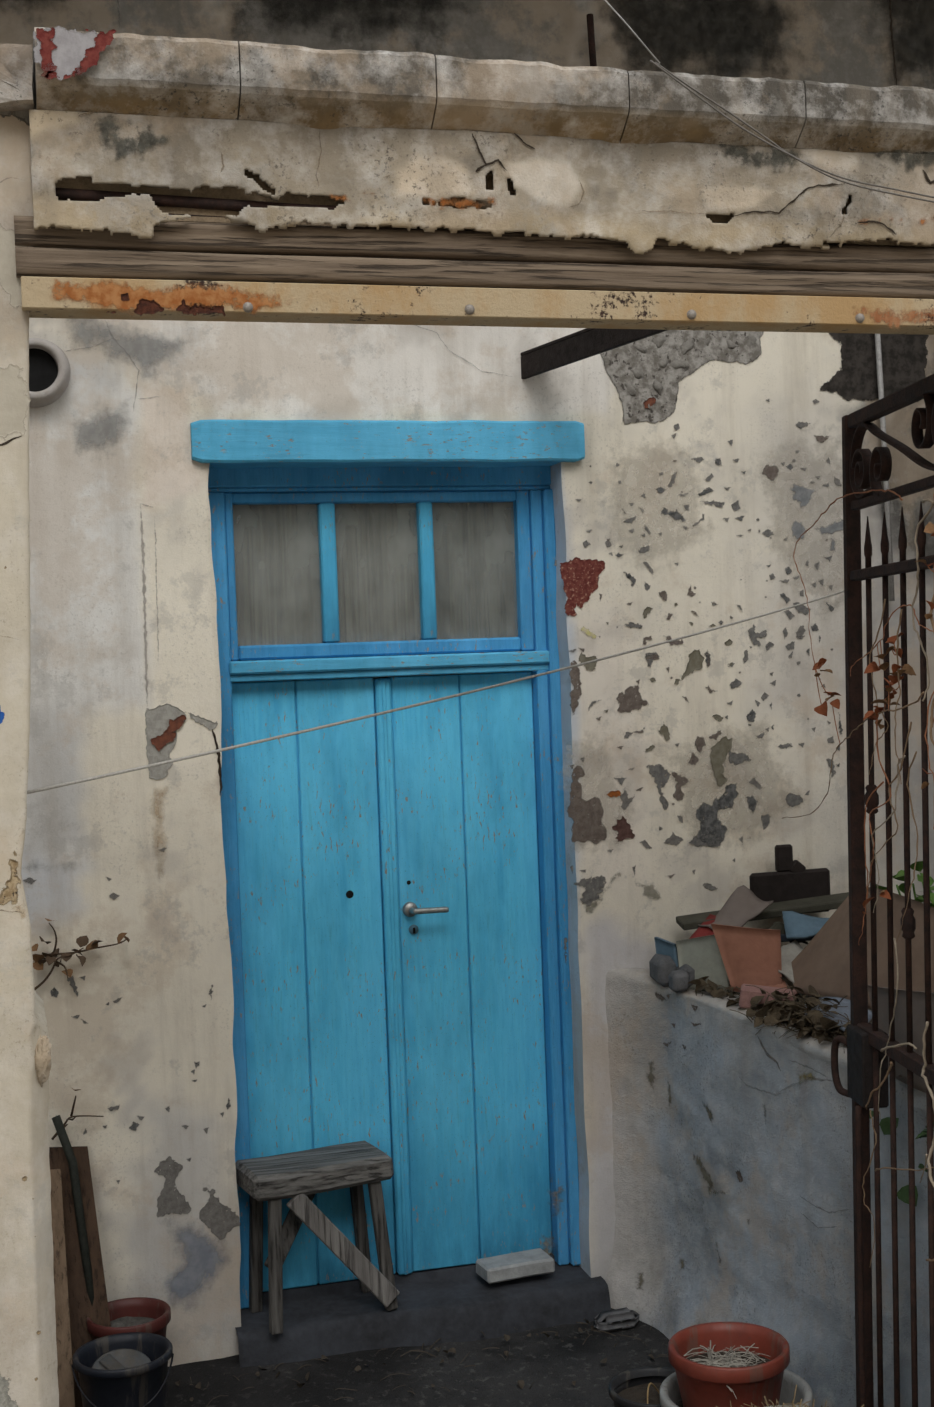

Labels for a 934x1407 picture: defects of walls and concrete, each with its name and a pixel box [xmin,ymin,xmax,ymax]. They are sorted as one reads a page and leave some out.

spalling [0,44,35,126]
crack [472,133,535,172]
crack [647,183,896,235]
peeling [0,224,27,308]
corrosion [52,280,280,316]
corrosion [861,307,934,328]
spalling [601,330,763,438]
peeling [813,333,929,404]
peeling [555,440,843,852]
spalling [145,703,218,780]
peeling [570,866,606,906]
peeling [155,1156,241,1239]